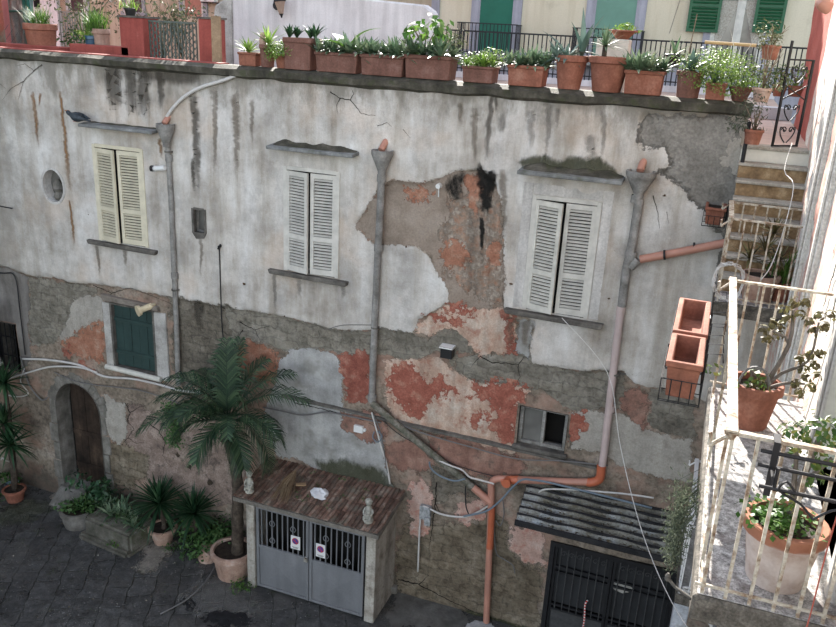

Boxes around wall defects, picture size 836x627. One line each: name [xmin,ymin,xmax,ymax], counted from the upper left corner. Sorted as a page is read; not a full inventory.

crack [0,64,42,99]
damp [106,68,197,108]
damp [190,97,200,182]
crack [330,91,385,126]
damp [487,97,497,140]
flaking render [636,112,742,239]
flaking render [27,276,106,372]
flaking render [167,170,698,627]